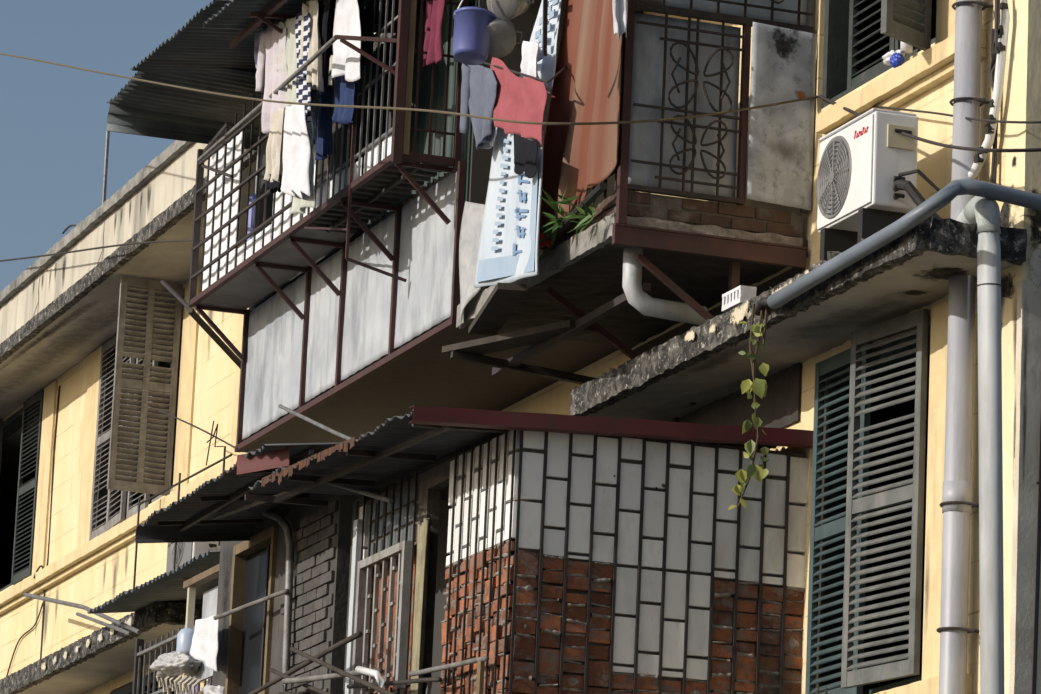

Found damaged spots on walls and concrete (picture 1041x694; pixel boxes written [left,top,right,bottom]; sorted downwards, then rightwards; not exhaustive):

water stain [1000,203,1014,228]
water stain [1028,209,1041,247]
water stain [913,268,966,280]
water stain [1001,273,1015,303]
water stain [1001,313,1027,376]
water stain [1013,406,1026,461]